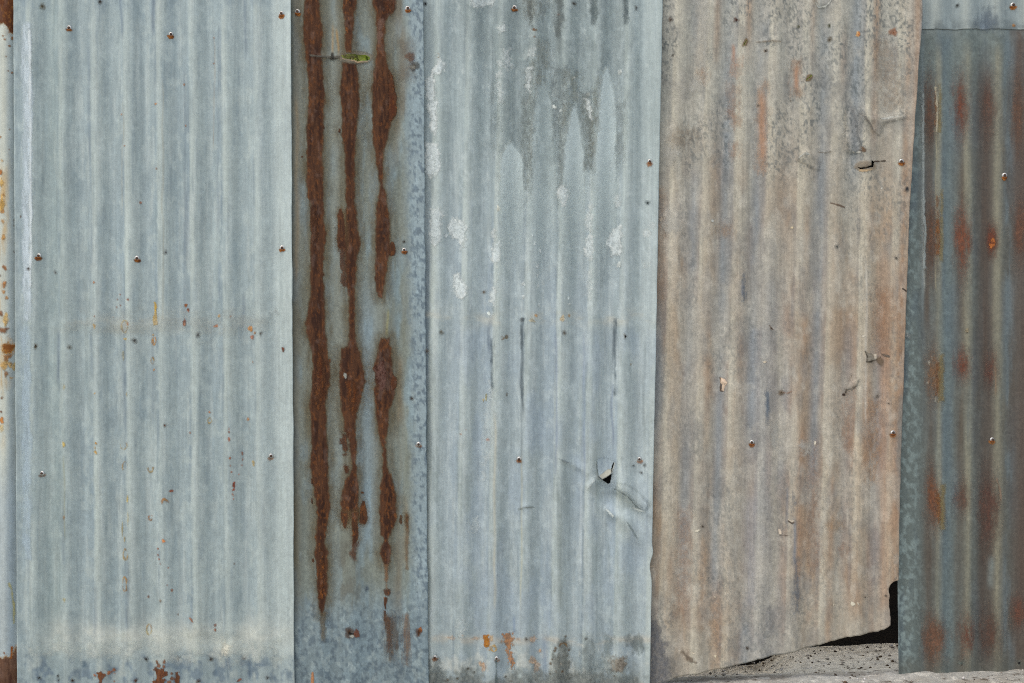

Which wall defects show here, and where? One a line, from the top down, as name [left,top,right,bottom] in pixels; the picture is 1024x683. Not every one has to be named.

damp [497,53,622,298]
damp [491,229,501,265]
rust [0,311,15,377]
rust [279,0,422,659]
rust [0,646,17,683]
rust [152,660,180,683]
rust [483,631,535,668]